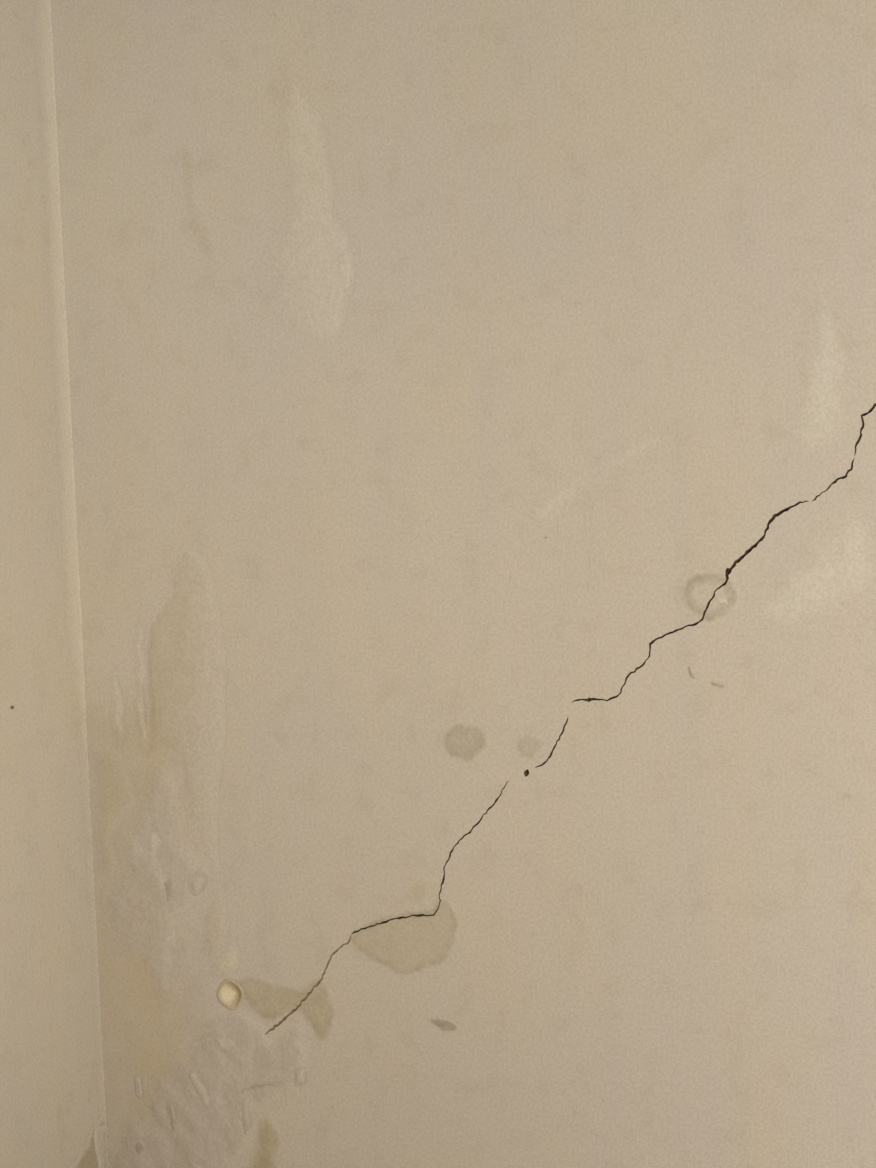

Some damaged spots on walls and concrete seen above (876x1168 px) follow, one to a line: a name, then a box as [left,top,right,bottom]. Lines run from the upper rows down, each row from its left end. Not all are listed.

damp [94,544,340,1048]
damp [437,718,493,768]
crack [265,403,876,1035]
damp [344,871,463,981]
damp [237,1111,287,1168]